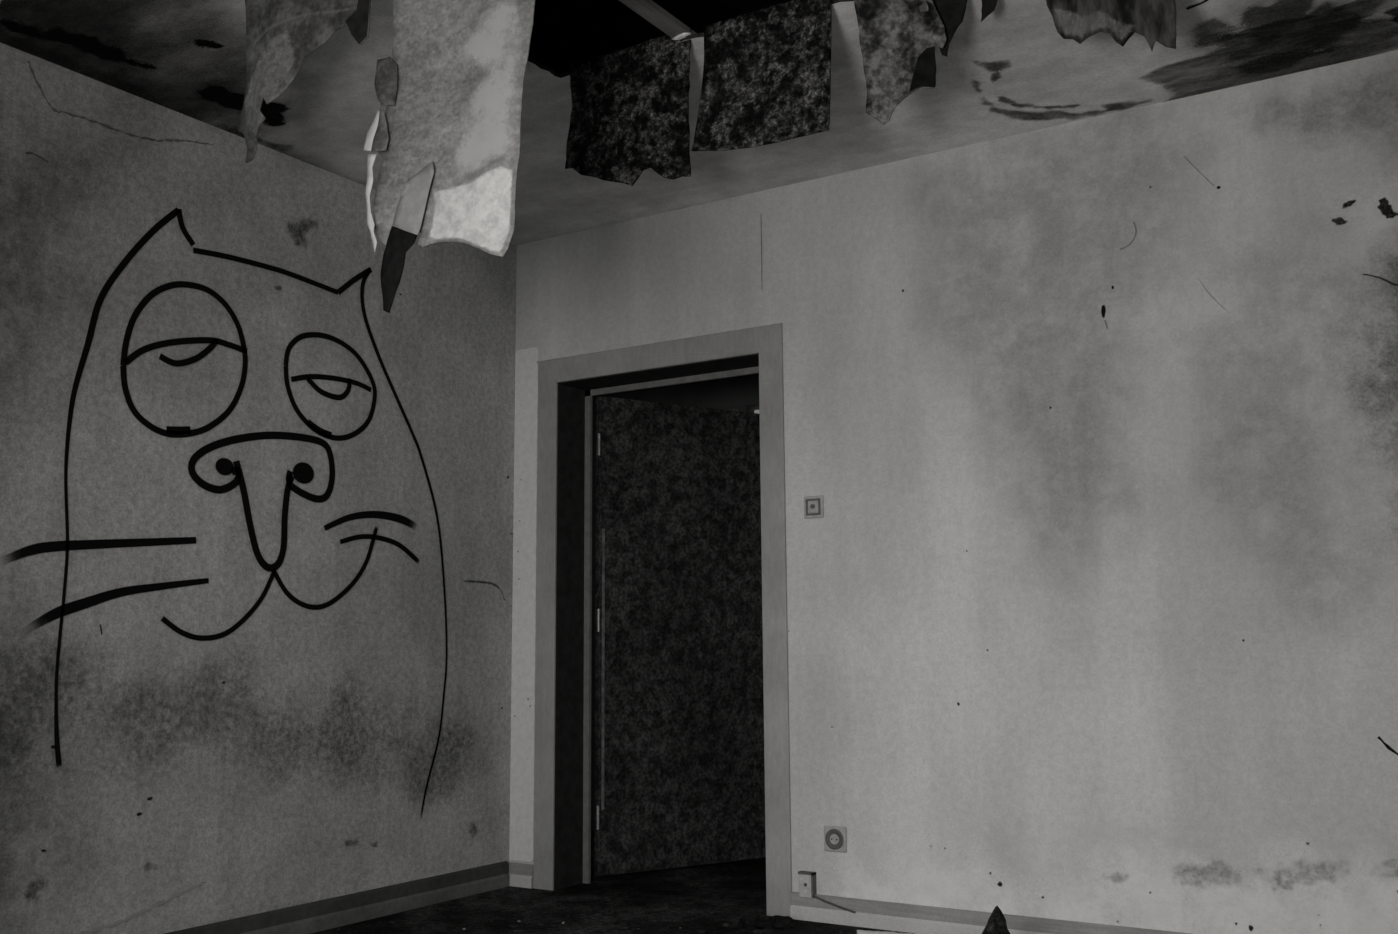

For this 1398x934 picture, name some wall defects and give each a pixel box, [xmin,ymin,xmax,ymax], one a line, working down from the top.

water stain [0,20,156,69]
water stain [195,39,224,49]
water stain [197,86,245,111]
water stain [260,99,288,127]
crack [1377,736,1398,755]